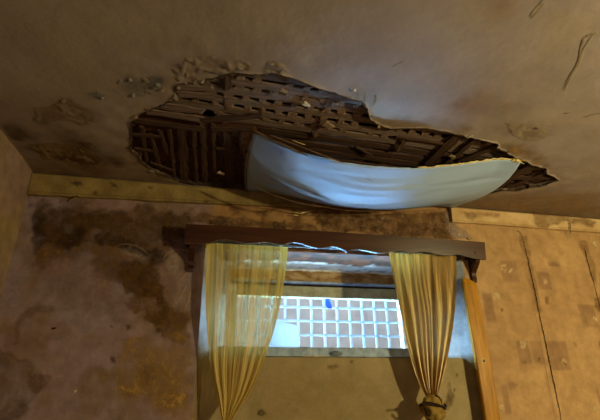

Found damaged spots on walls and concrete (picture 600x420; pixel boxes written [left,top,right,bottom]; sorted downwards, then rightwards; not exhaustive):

peeling [129,55,559,194]
crack [562,33,596,91]
leakage [33,200,317,413]
crack [518,231,561,418]